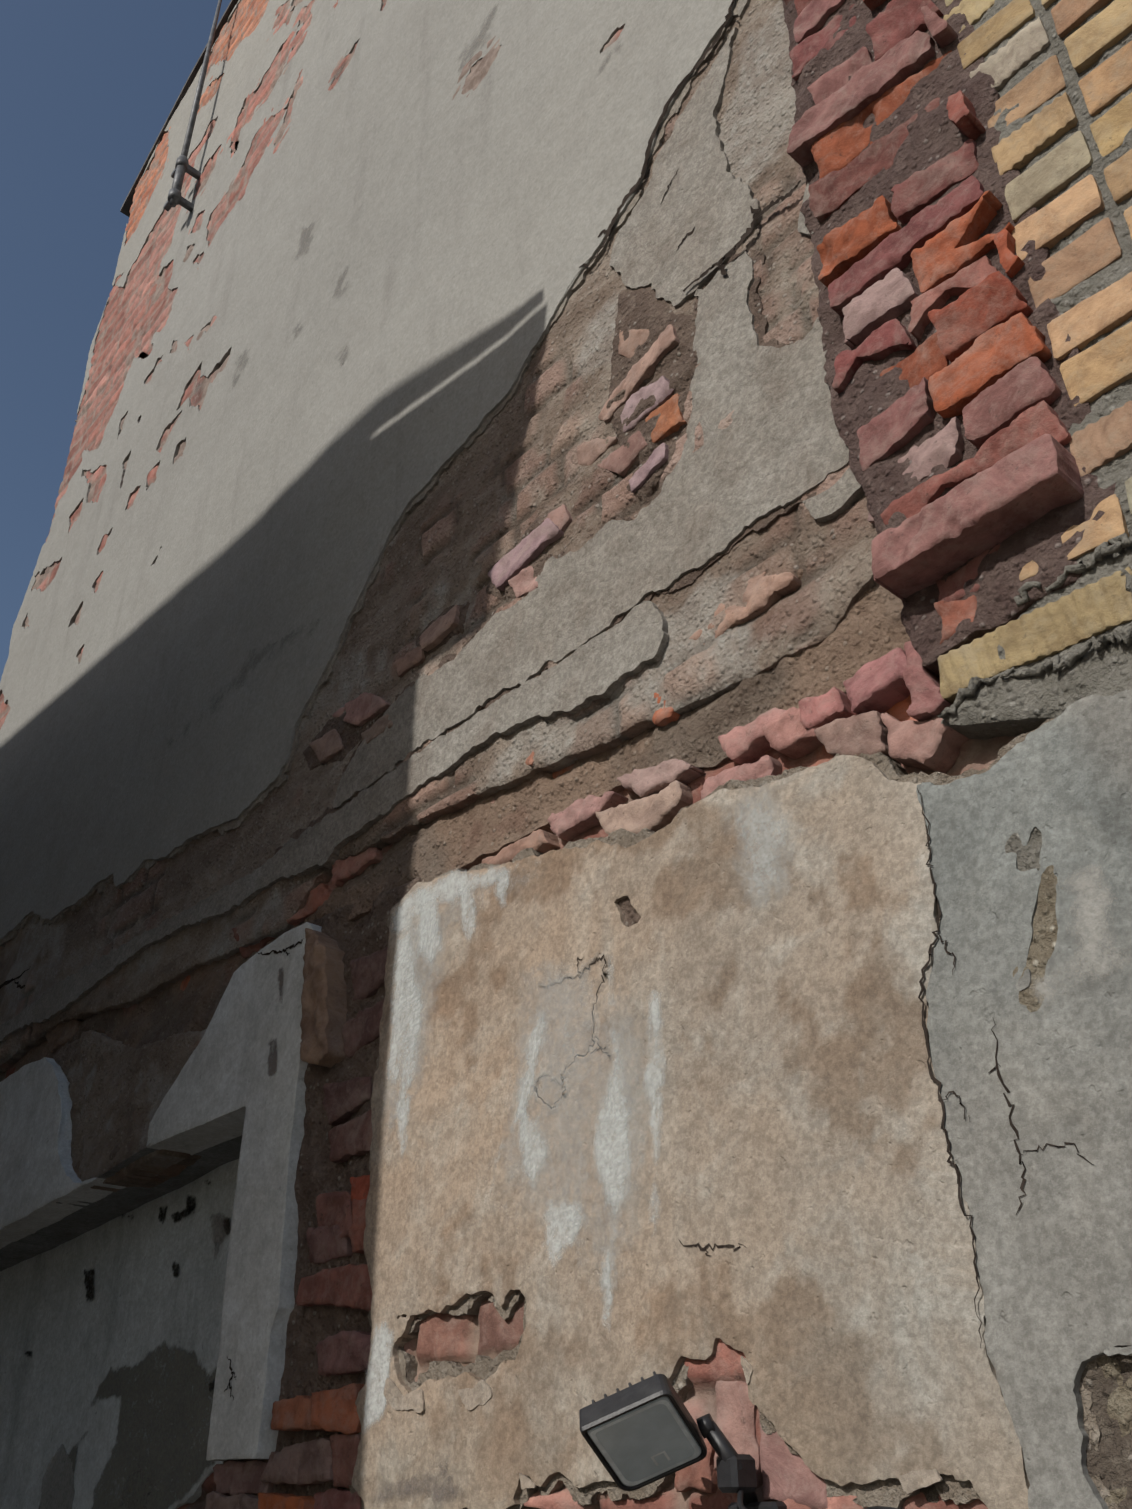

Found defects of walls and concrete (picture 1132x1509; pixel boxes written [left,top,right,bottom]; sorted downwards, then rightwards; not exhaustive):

spalling [0,0,1121,1192]
efflorescence [387,869,508,1138]
leakage [516,1018,546,1179]
crack [532,949,612,1115]
efflorescence [595,1050,630,1211]
crack [917,788,982,1348]
crack [989,1019,1094,1215]
leakage [547,1205,581,1258]
efflorescence [364,1324,392,1428]
spalling [383,1290,527,1413]
spalling [512,1339,988,1509]
flaking render [1079,1346,1132,1509]